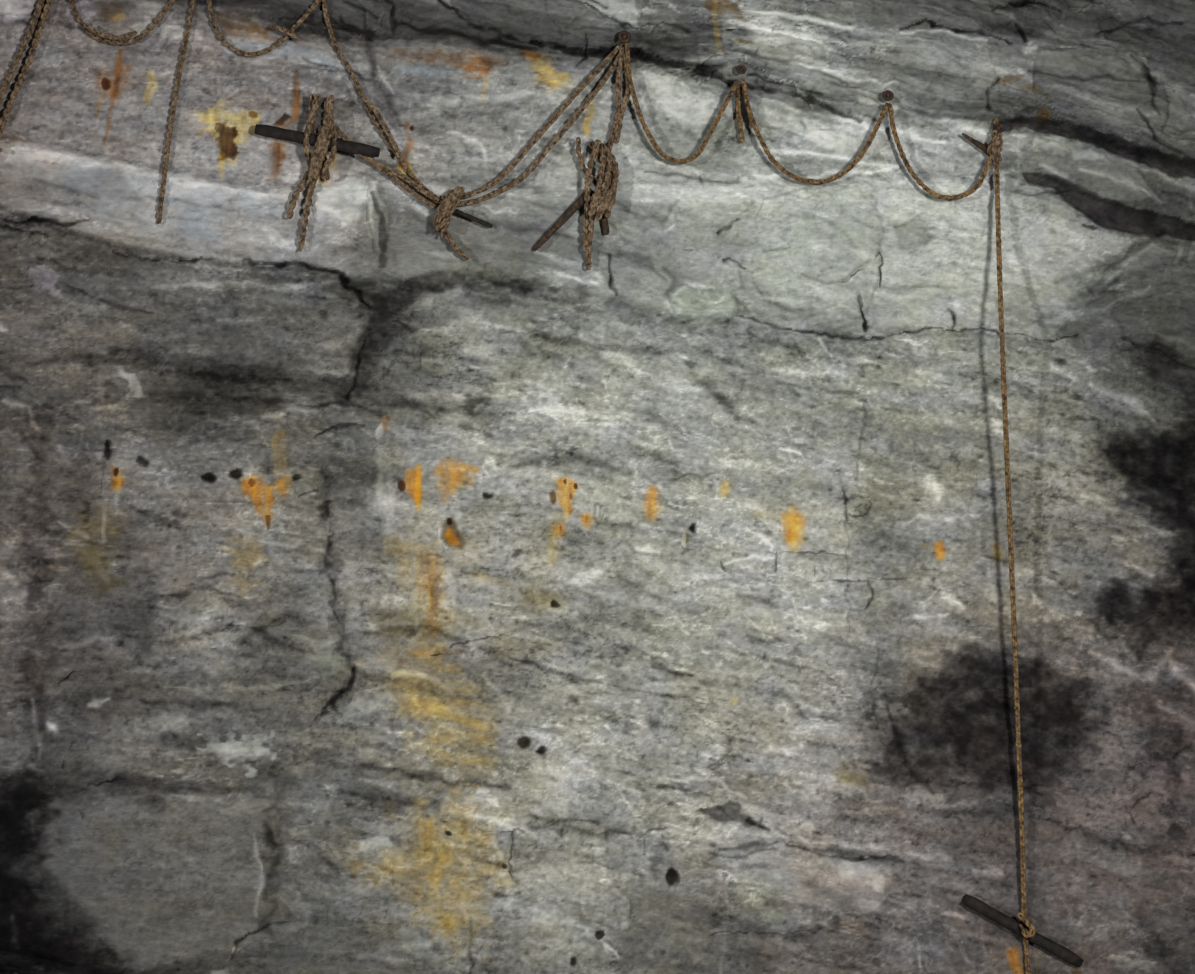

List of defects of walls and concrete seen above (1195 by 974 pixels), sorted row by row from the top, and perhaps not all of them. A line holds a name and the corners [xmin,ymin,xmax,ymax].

crack [0,216,92,238]
corrosion [192,72,304,184]
crack [434,0,865,125]
crack [9,401,139,823]
damp [158,730,241,753]
corrosion [217,429,296,599]
crack [112,250,413,724]
corrosion [339,453,597,965]
corrosion [752,503,809,557]
damp [851,333,1195,846]
damp [0,759,271,974]
crack [230,755,299,961]